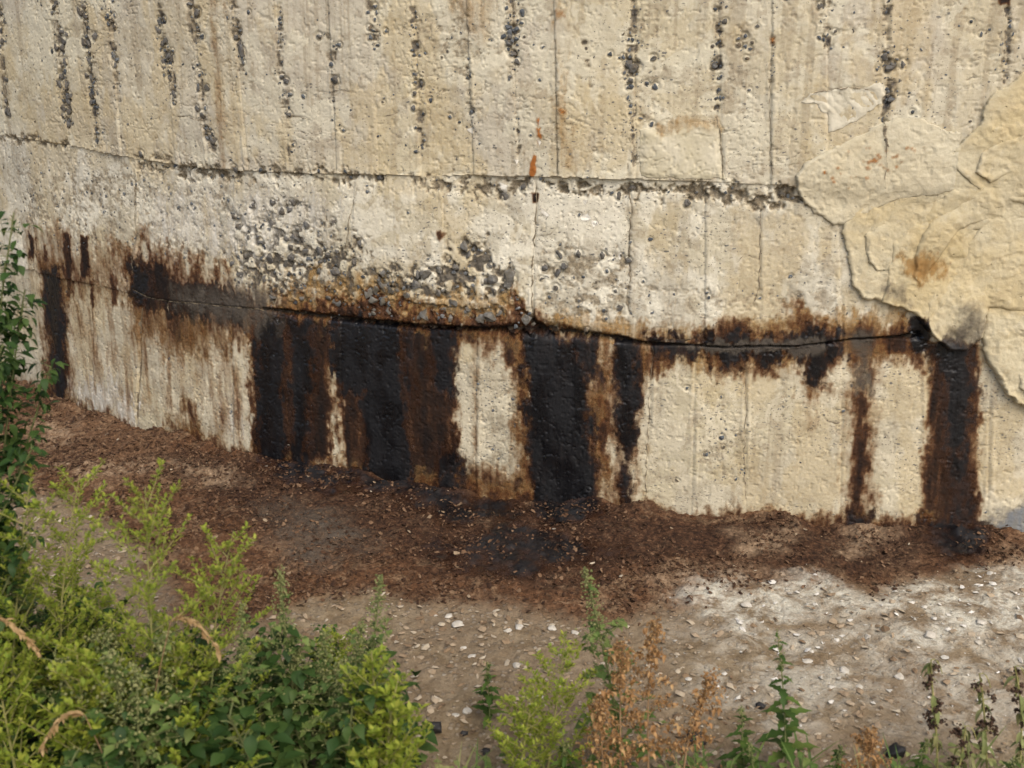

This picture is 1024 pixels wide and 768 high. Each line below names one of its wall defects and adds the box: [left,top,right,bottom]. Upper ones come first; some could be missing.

spalling [0,0,632,329]
damp [7,262,141,427]
crack [131,171,719,499]
rust [267,264,709,400]
damp [119,185,989,527]
crack [781,333,913,348]
rust [459,416,529,499]